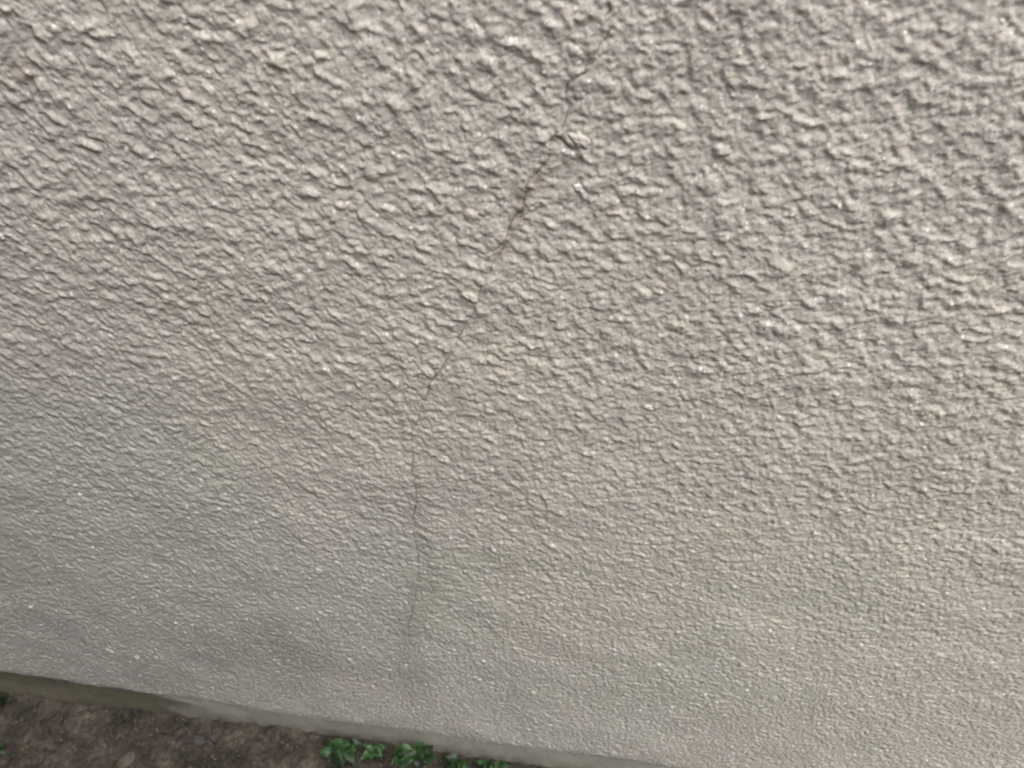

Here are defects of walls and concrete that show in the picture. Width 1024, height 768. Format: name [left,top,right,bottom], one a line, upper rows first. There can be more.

crack [566,1,620,88]